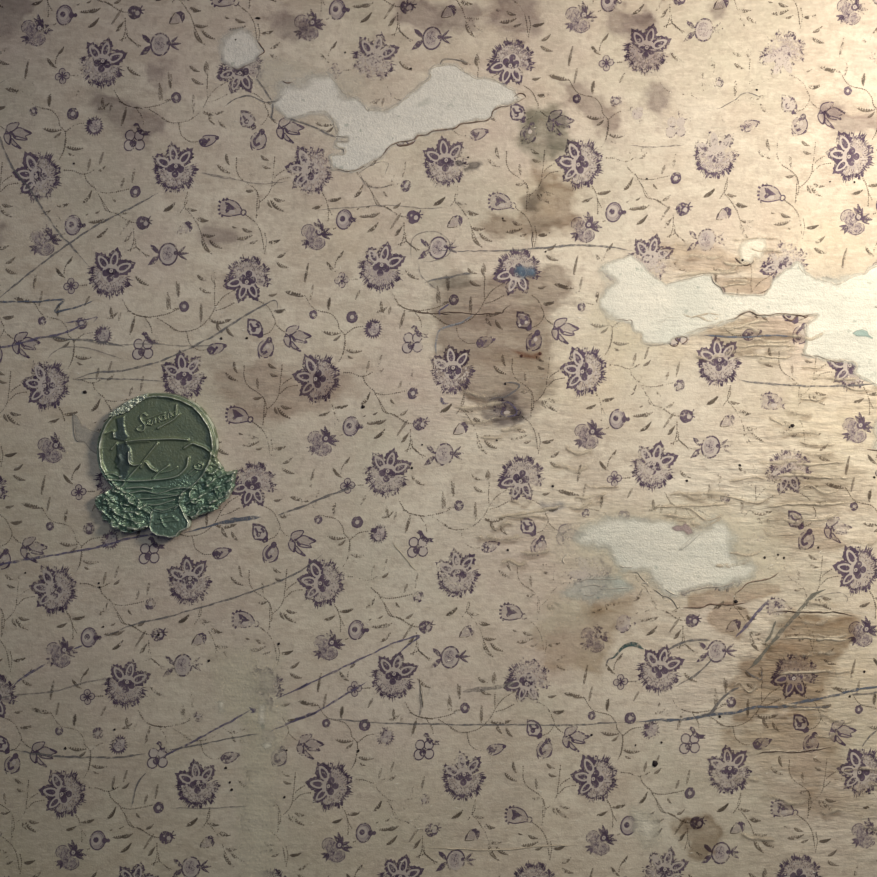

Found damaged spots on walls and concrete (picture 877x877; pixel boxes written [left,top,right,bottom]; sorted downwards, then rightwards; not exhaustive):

peeling [220,29,265,70]
peeling [272,58,526,172]
peeling [600,255,877,386]
peeling [575,517,779,609]